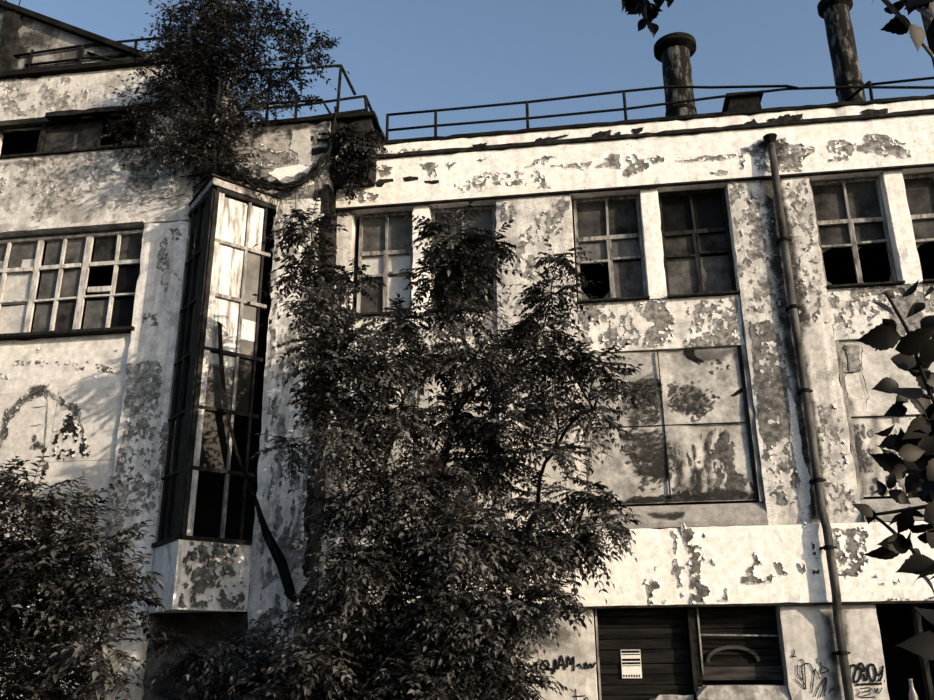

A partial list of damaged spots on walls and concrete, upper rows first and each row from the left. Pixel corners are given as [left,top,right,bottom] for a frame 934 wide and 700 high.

peeling [0,74,93,116]
peeling [0,150,115,223]
peeling [419,161,458,177]
peeling [155,227,182,295]
peeling [380,288,676,359]
peeling [454,133,934,515]
peeling [0,347,168,574]
peeling [178,208,315,682]
peeling [644,566,667,605]
peeling [671,523,730,604]
peeling [740,540,822,585]
peeling [833,527,902,586]